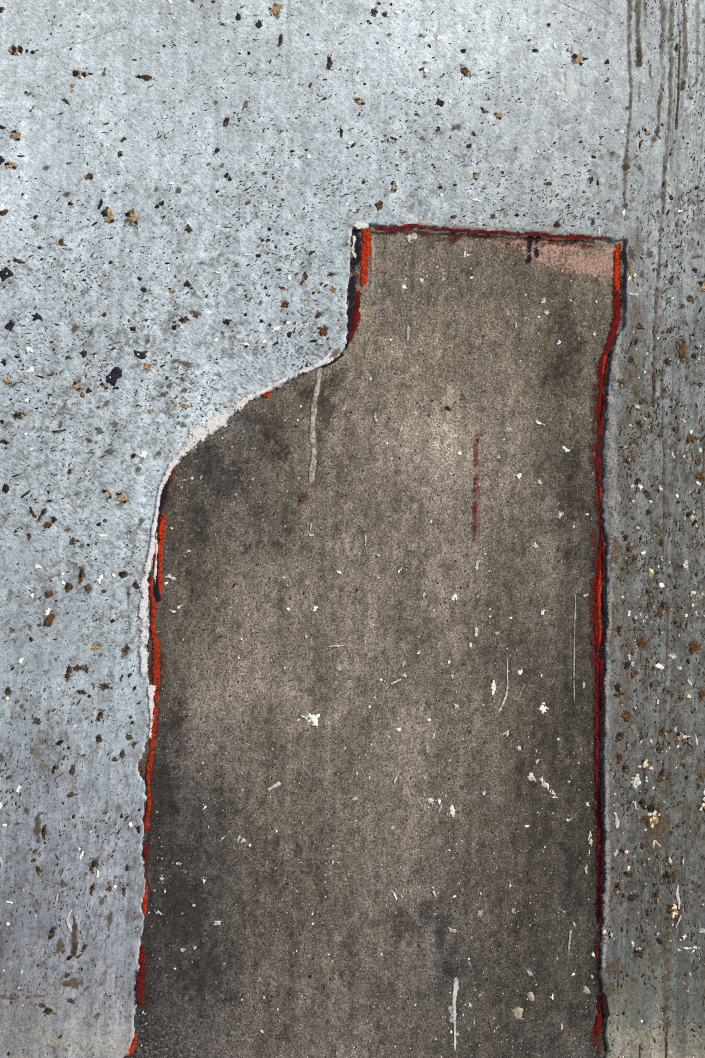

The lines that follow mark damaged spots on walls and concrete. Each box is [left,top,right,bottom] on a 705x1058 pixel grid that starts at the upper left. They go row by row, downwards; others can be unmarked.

spalling [98,199,140,227]
damp [623,0,688,560]
spalling [679,267,705,309]
peeling [72,367,122,397]
spalling [102,489,127,506]
spalling [677,500,698,526]
peeling [112,213,685,1058]
spalling [64,658,113,698]
spalling [95,709,105,744]
spalling [85,858,126,898]